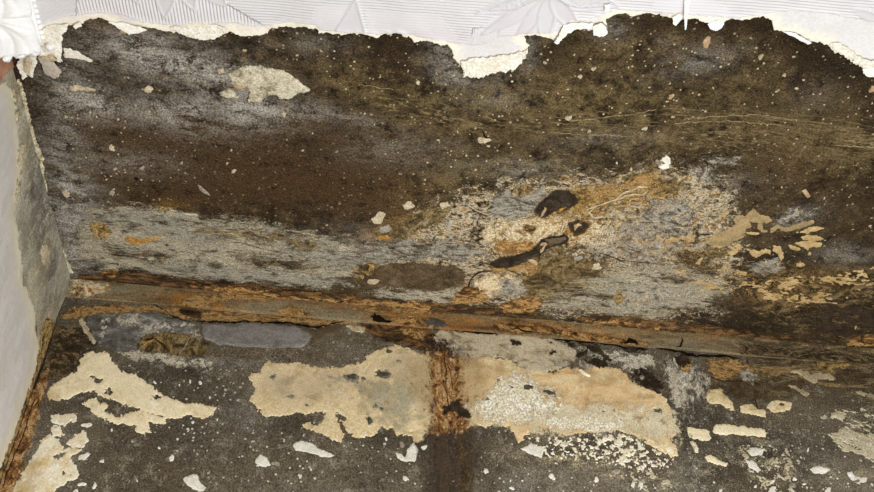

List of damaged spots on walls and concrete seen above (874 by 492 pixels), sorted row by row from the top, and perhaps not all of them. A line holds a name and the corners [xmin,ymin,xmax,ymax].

spalling [217,65,310,102]
peeling [460,49,528,83]
water stain [675,114,797,125]
peeling [0,22,92,468]
peeling [673,208,874,308]
water stain [43,318,97,380]
peeling [12,351,218,492]
peeling [248,344,436,450]
corrosion [0,269,810,492]
water stain [70,155,874,492]
peeling [457,357,806,492]
corrosion [845,333,874,347]